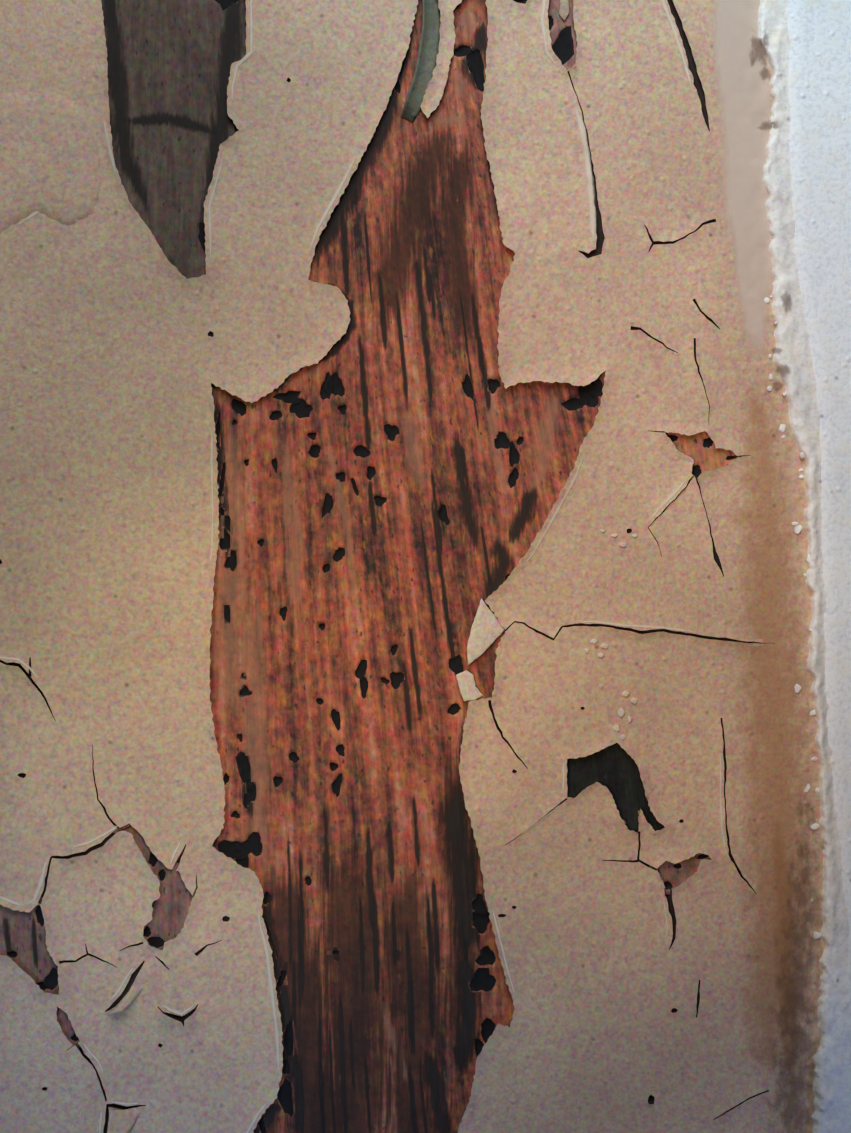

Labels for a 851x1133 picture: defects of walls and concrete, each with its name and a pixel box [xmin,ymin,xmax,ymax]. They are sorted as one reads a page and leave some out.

crack [661,0,710,131]
peeling [101,0,253,279]
crack [568,72,605,258]
peeling [657,431,741,483]
peeling [209,0,605,1133]
crack [505,621,773,644]
crack [29,745,132,903]
peeling [113,823,197,950]
peeling [562,691,664,832]
peeling [0,896,80,1048]
crack [61,942,198,1025]
crack [67,1041,146,1133]